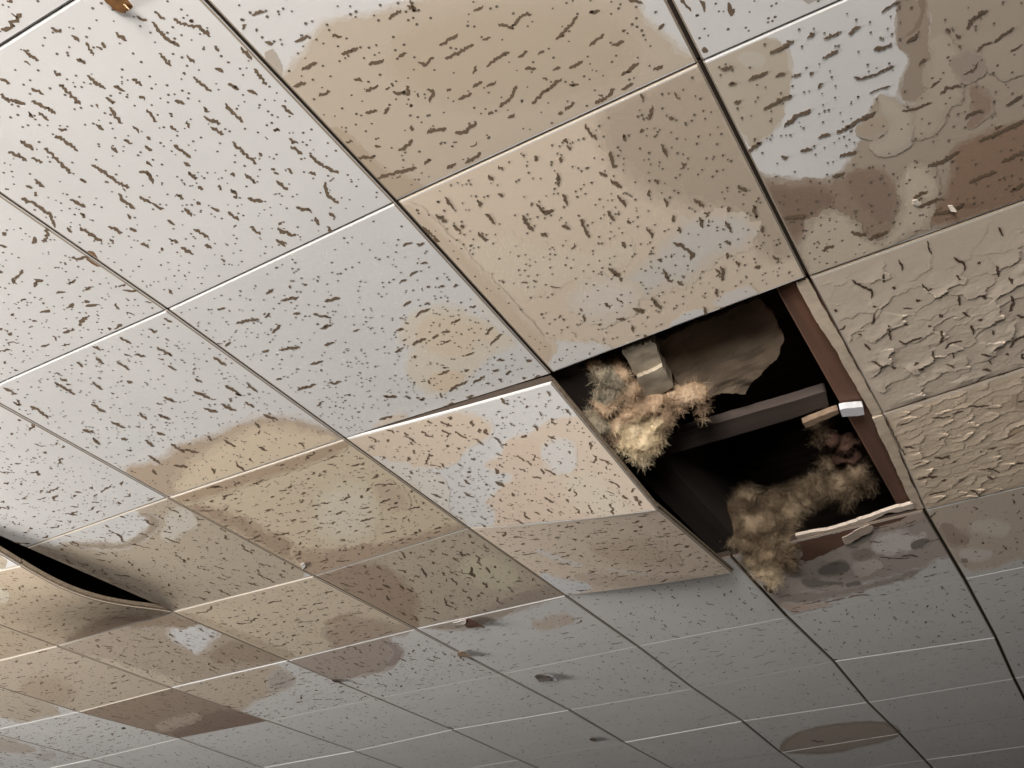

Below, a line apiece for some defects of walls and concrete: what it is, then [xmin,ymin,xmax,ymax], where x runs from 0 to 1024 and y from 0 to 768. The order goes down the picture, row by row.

water stain [265,0,1024,400]
peeling [670,286,758,327]
crack [834,241,1024,376]
peeling [548,339,612,371]
crack [886,405,1024,496]
water stain [0,410,730,738]
spalling [796,516,907,562]
water stain [766,488,1024,614]
water stain [779,720,901,755]